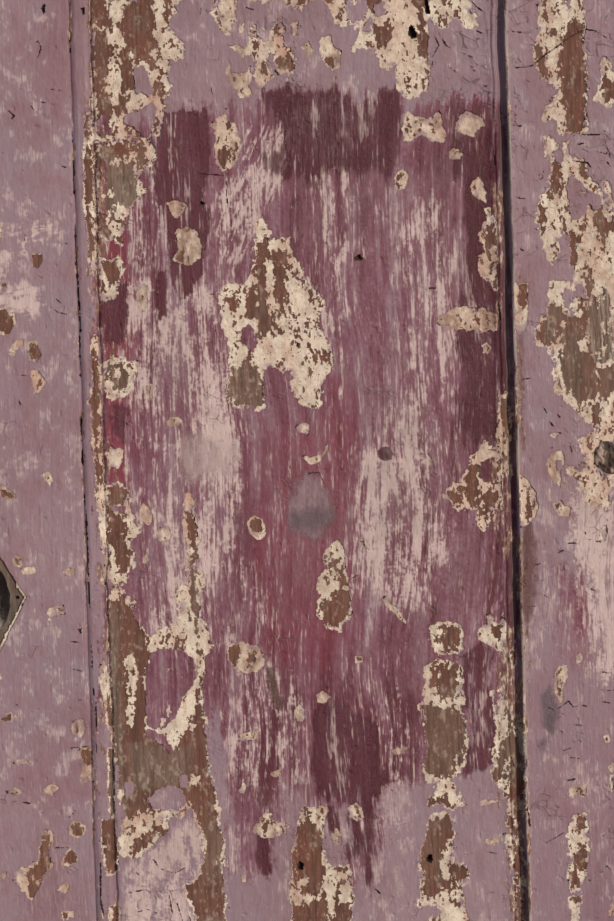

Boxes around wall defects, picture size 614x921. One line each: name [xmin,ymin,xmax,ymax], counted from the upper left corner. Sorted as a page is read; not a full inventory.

peeling [210,0,480,100]
crack [432,1,487,87]
crack [516,28,614,68]
peeling [81,0,186,303]
crack [572,131,611,167]
peeling [218,216,335,412]
peeling [514,0,614,511]
peeling [442,391,539,532]
peeling [86,334,230,921]
peeling [253,804,355,921]
peeling [417,621,471,921]
peeling [479,686,528,921]